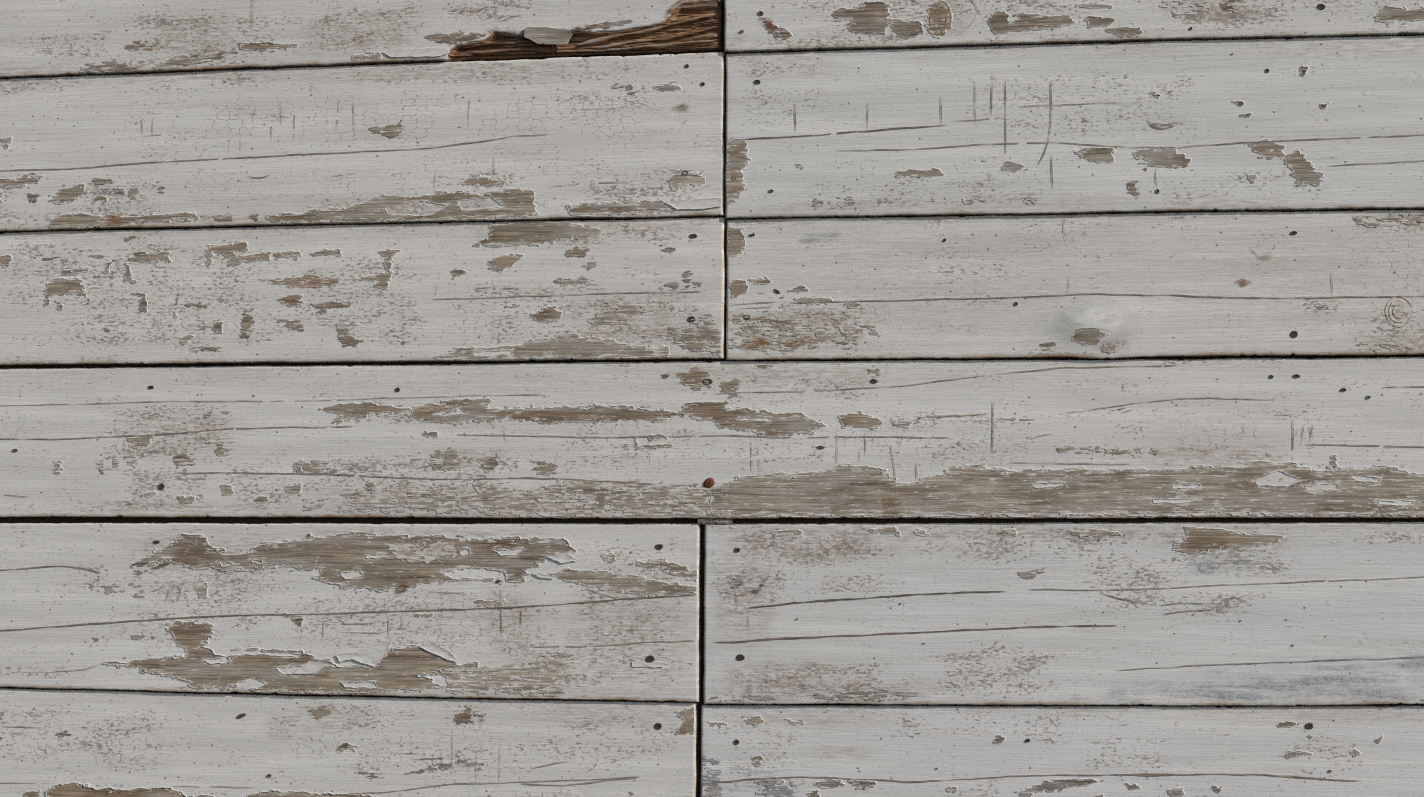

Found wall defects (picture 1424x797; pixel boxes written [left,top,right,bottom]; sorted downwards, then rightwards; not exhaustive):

peeling [832,0,925,39]
peeling [986,3,1143,42]
peeling [1071,145,1191,199]
peeling [0,136,751,314]
peeling [205,240,401,347]
peeling [254,227,1424,554]
crack [0,565,100,573]
peeling [102,531,698,609]
crack [0,574,1424,647]
peeling [103,620,575,724]
crack [1117,657,1424,671]
peeling [23,782,215,797]